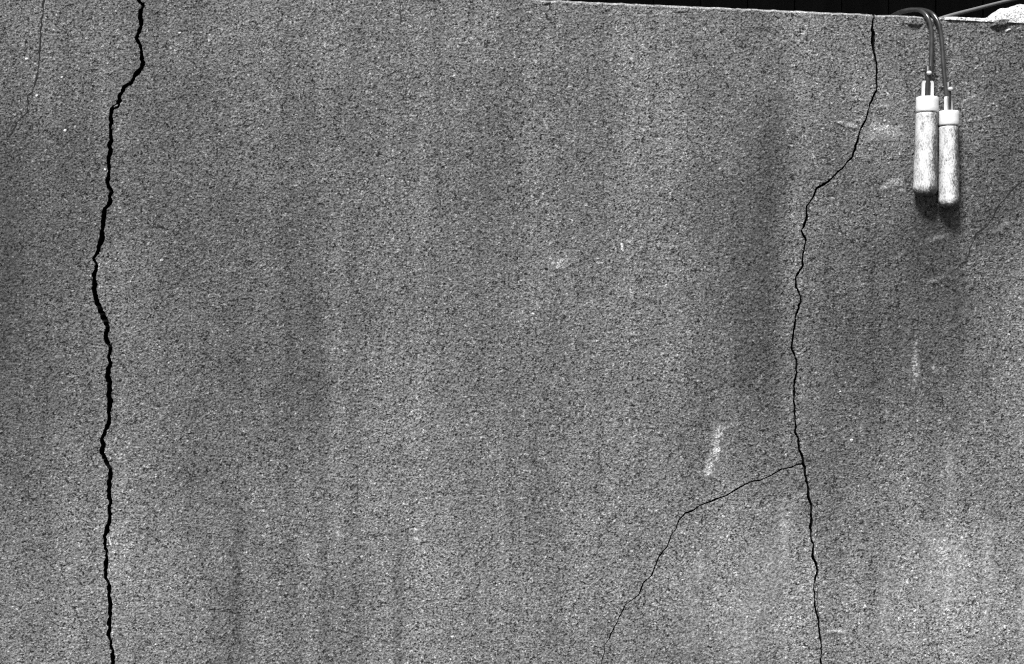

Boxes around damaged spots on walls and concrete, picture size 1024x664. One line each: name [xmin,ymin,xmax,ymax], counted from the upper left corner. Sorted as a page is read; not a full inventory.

crack [91,0,146,664]
crack [601,17,878,664]